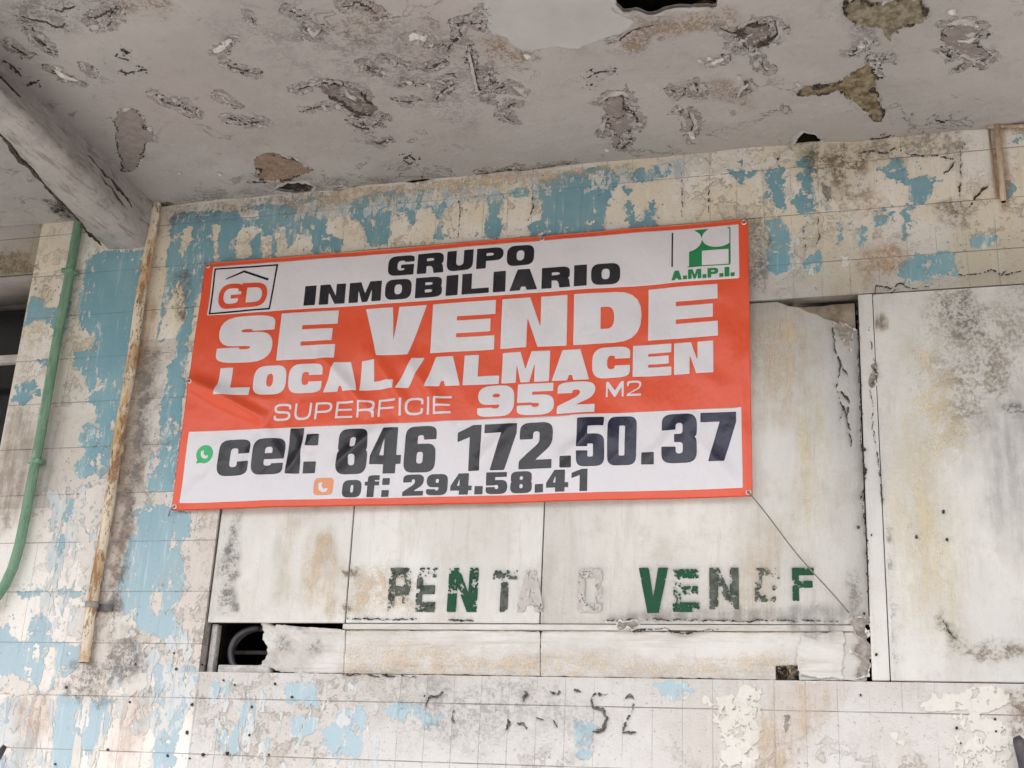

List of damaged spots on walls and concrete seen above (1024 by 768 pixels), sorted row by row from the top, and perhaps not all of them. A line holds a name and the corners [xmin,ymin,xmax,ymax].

spalling [611,0,720,16]
spalling [839,0,930,42]
peeling [940,8,996,65]
peeling [111,107,154,172]
peeling [315,80,378,117]
spalling [793,63,889,122]
peeling [727,131,998,290]
water stain [920,297,1004,457]
peeling [0,152,686,768]
crack [832,282,929,593]
peeling [653,680,767,768]
peeling [919,685,1017,768]